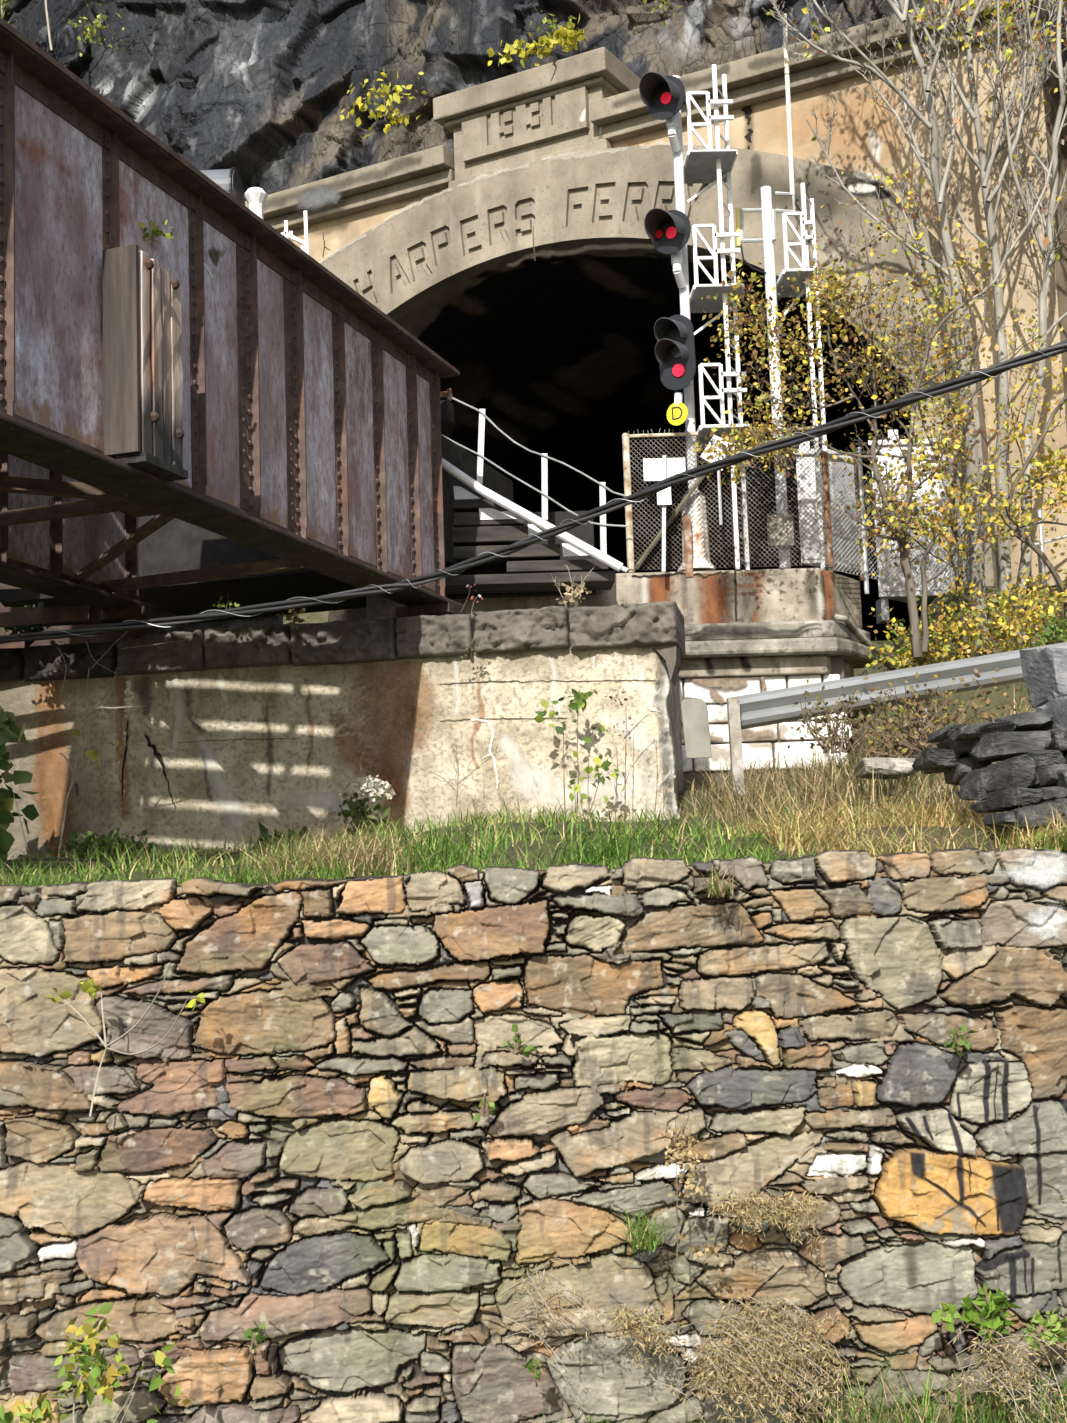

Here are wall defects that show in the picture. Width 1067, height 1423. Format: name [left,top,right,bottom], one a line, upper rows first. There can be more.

corrosion [649,572,759,624]
corrosion [821,570,833,620]
crack [442,679,661,713]
crack [118,680,298,812]
corrosion [334,661,431,832]